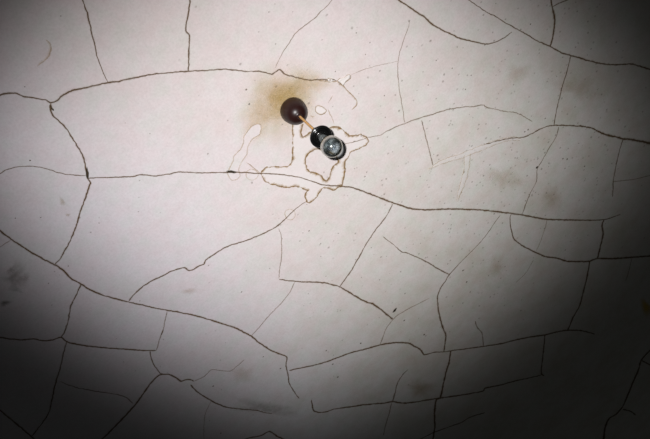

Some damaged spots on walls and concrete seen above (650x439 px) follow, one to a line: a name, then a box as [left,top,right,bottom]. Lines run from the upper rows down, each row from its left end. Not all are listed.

crack [0,0,435,439]
crack [235,172,650,439]
crack [390,0,650,197]